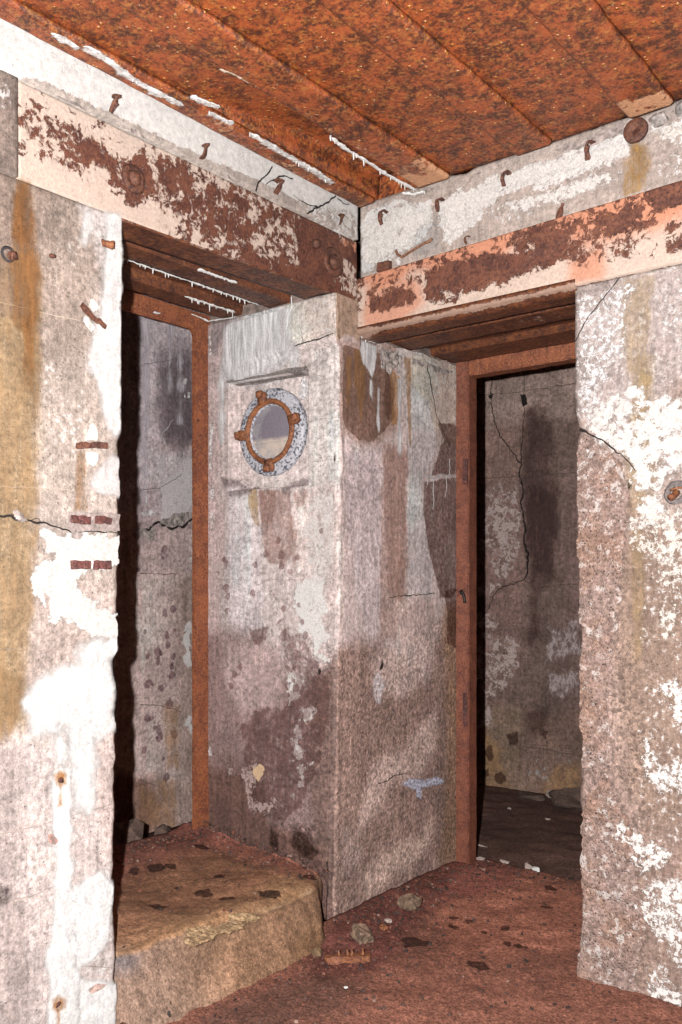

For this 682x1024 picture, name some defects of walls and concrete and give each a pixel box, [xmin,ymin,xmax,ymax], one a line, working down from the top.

crack [255,166,350,215]
crack [0,487,192,539]
leakage [141,311,161,516]
leakage [81,212,300,470]
leakage [360,336,383,431]
crack [411,367,576,621]
crack [579,428,635,470]
peeling [30,528,120,639]
leakage [543,620,581,660]
leakage [549,671,578,697]
spalling [576,281,682,1007]